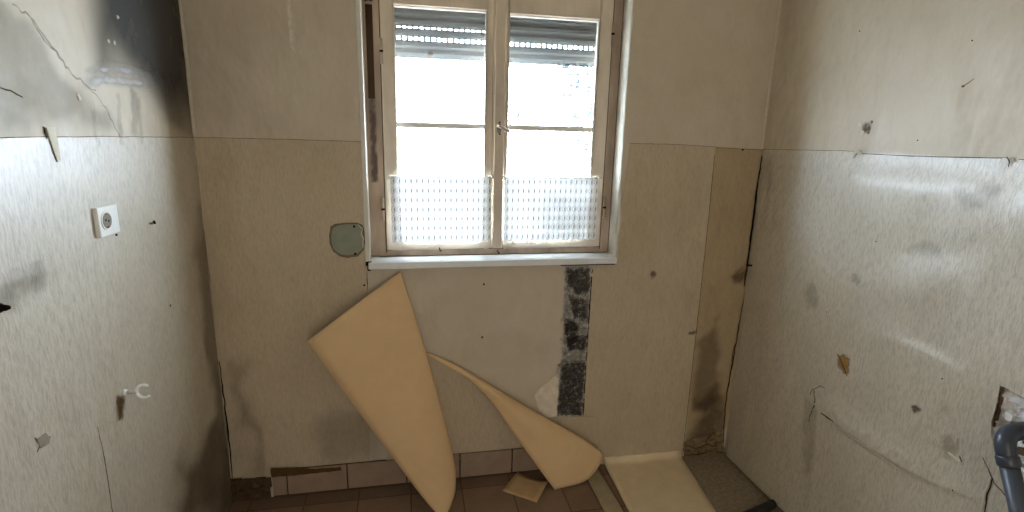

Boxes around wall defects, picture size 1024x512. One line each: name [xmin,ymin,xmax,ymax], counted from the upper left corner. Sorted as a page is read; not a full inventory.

spalling [535,266,593,418]
spalling [991,386,1024,441]